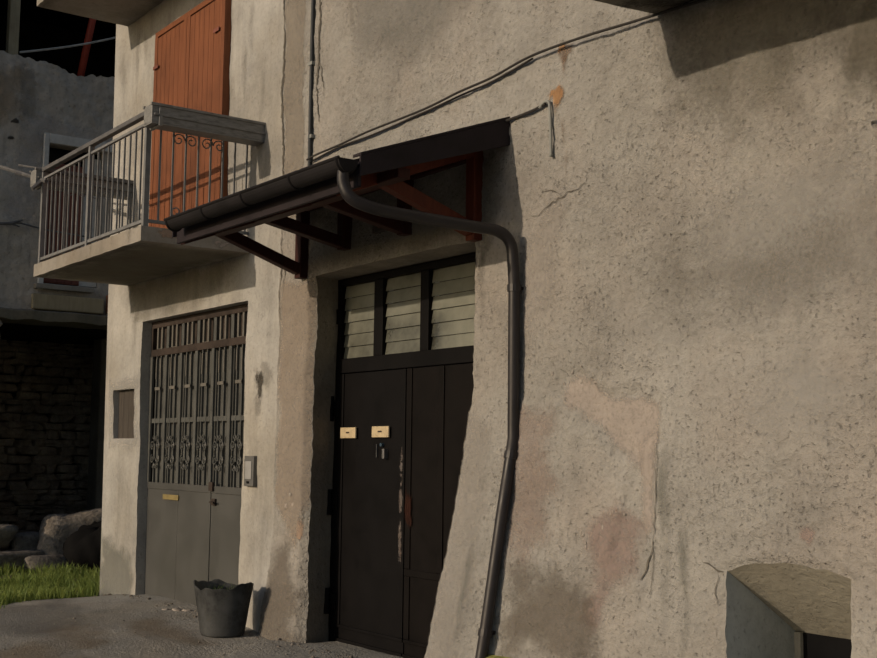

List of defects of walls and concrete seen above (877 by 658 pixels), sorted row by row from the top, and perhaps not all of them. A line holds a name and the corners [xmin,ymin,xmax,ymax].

crack [538,182,585,216]
crack [641,432,659,595]